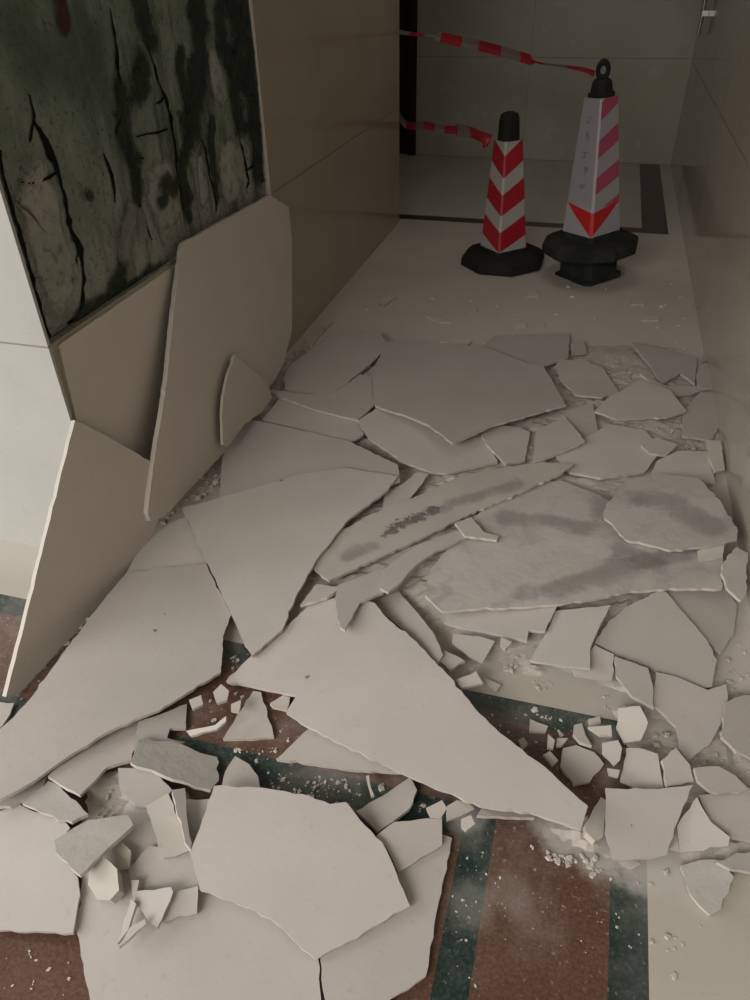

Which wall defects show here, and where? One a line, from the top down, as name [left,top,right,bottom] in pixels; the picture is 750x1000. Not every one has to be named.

crack [0,95,86,338]
crack [110,8,121,78]
leakage [75,0,169,322]
spalling [0,0,266,338]
crack [104,48,184,240]
crack [202,140,217,212]
leakage [158,0,266,223]
crack [236,120,263,189]
spalling [300,569,512,693]
spalling [0,684,290,944]
spalling [356,775,535,873]
spalling [530,605,750,916]